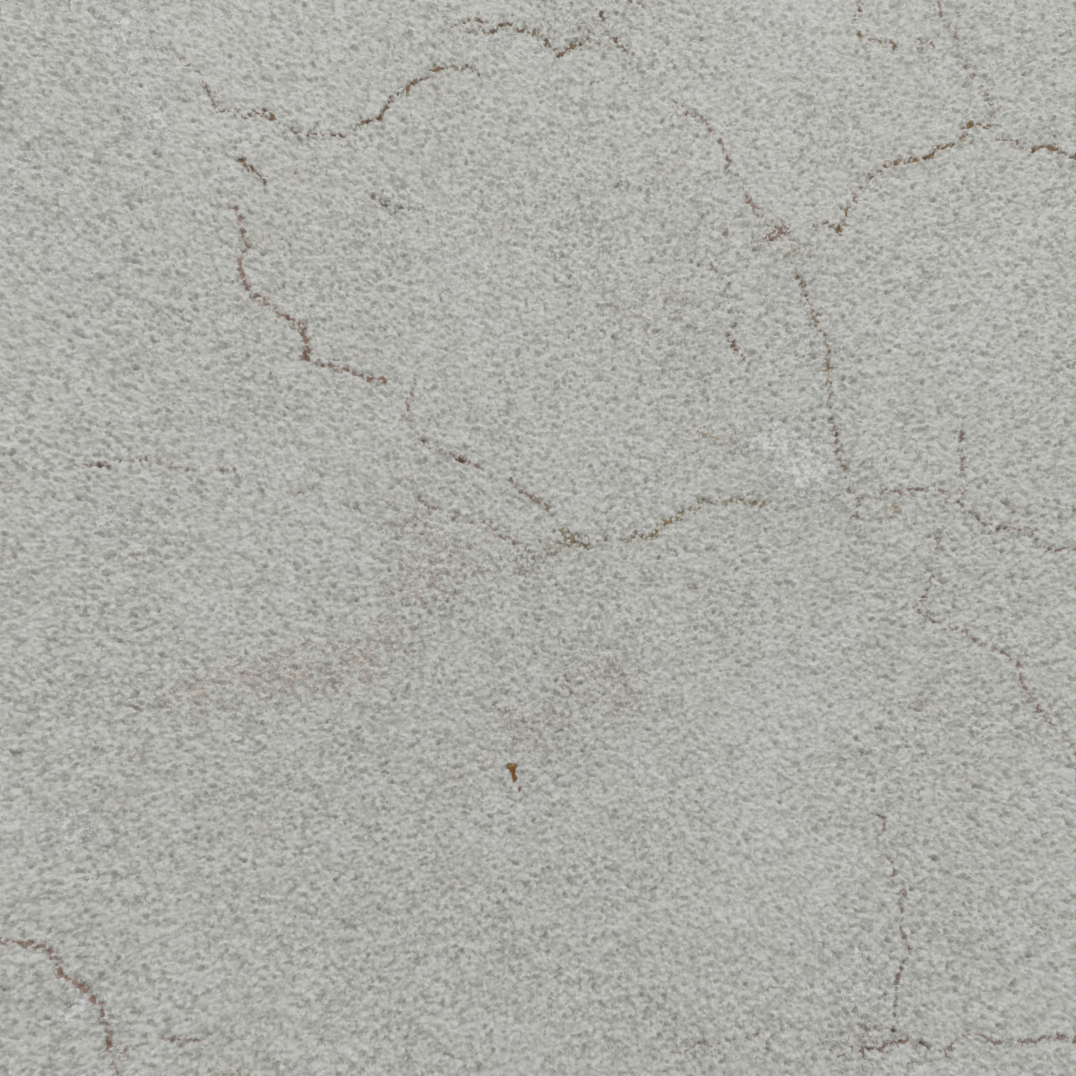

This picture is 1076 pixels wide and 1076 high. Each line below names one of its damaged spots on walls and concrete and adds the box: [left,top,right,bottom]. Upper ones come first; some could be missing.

crack [180,58,277,121]
crack [307,64,480,140]
crack [443,11,628,58]
crack [676,103,788,251]
crack [823,2,1076,236]
crack [221,196,479,468]
crack [791,273,1076,552]
crack [508,478,771,550]
corrosion [456,649,652,796]
crack [917,576,1076,756]
crack [0,937,199,1074]
crack [829,862,1076,1056]